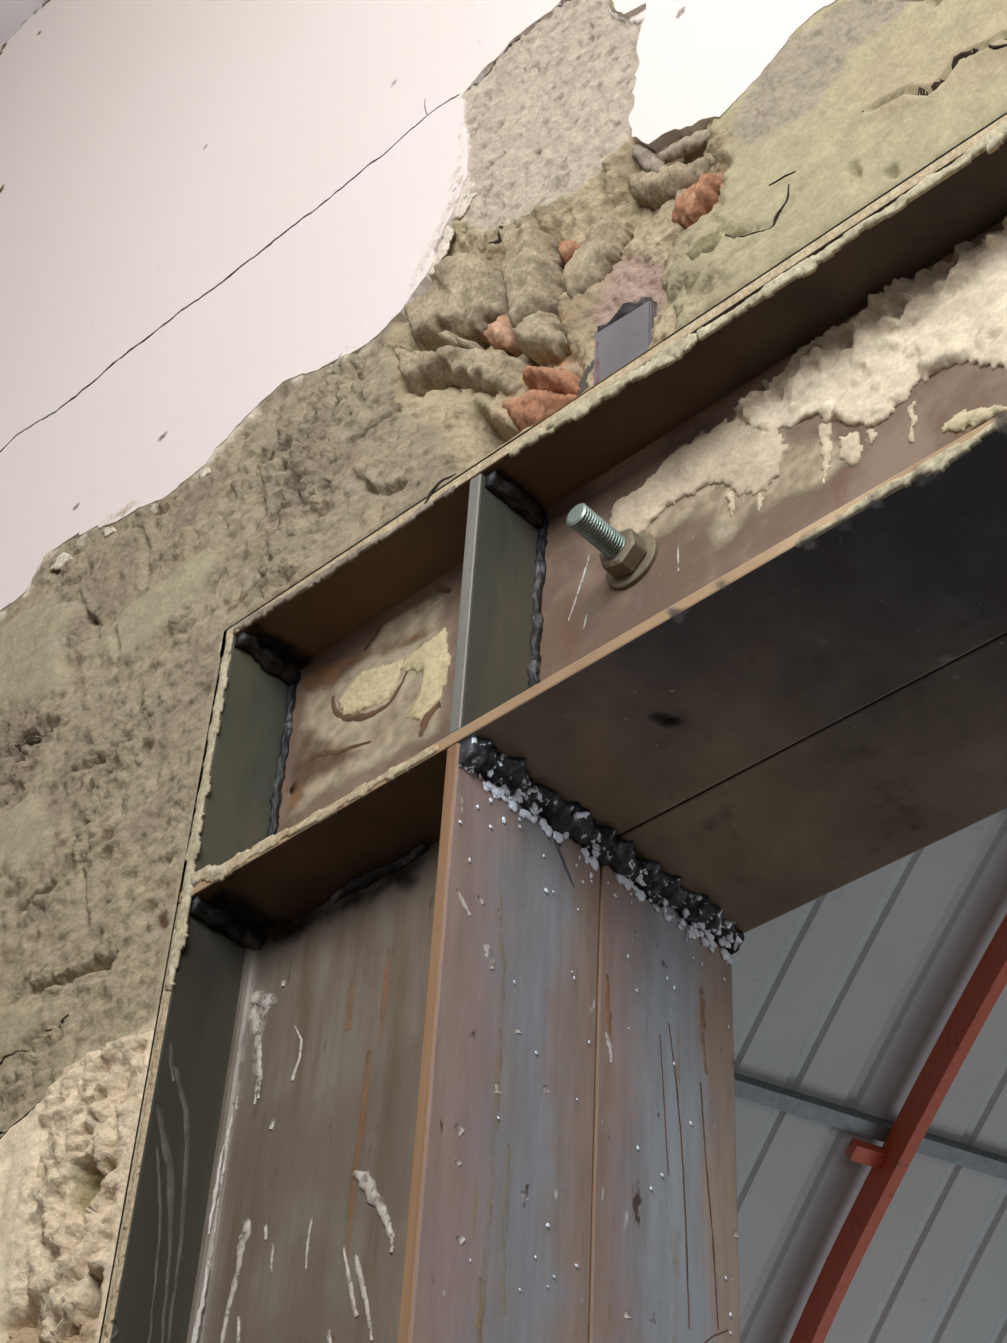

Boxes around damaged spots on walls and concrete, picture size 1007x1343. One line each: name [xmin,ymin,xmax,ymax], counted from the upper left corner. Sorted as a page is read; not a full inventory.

crack [912,39,1007,96]
crack [0,0,572,452]
spalling [386,0,759,471]
crack [725,171,796,238]
crack [424,473,456,504]
peeling [49,552,74,571]
crack [0,1014,69,1065]
crack [0,1100,42,1139]
spalling [0,1019,156,1343]